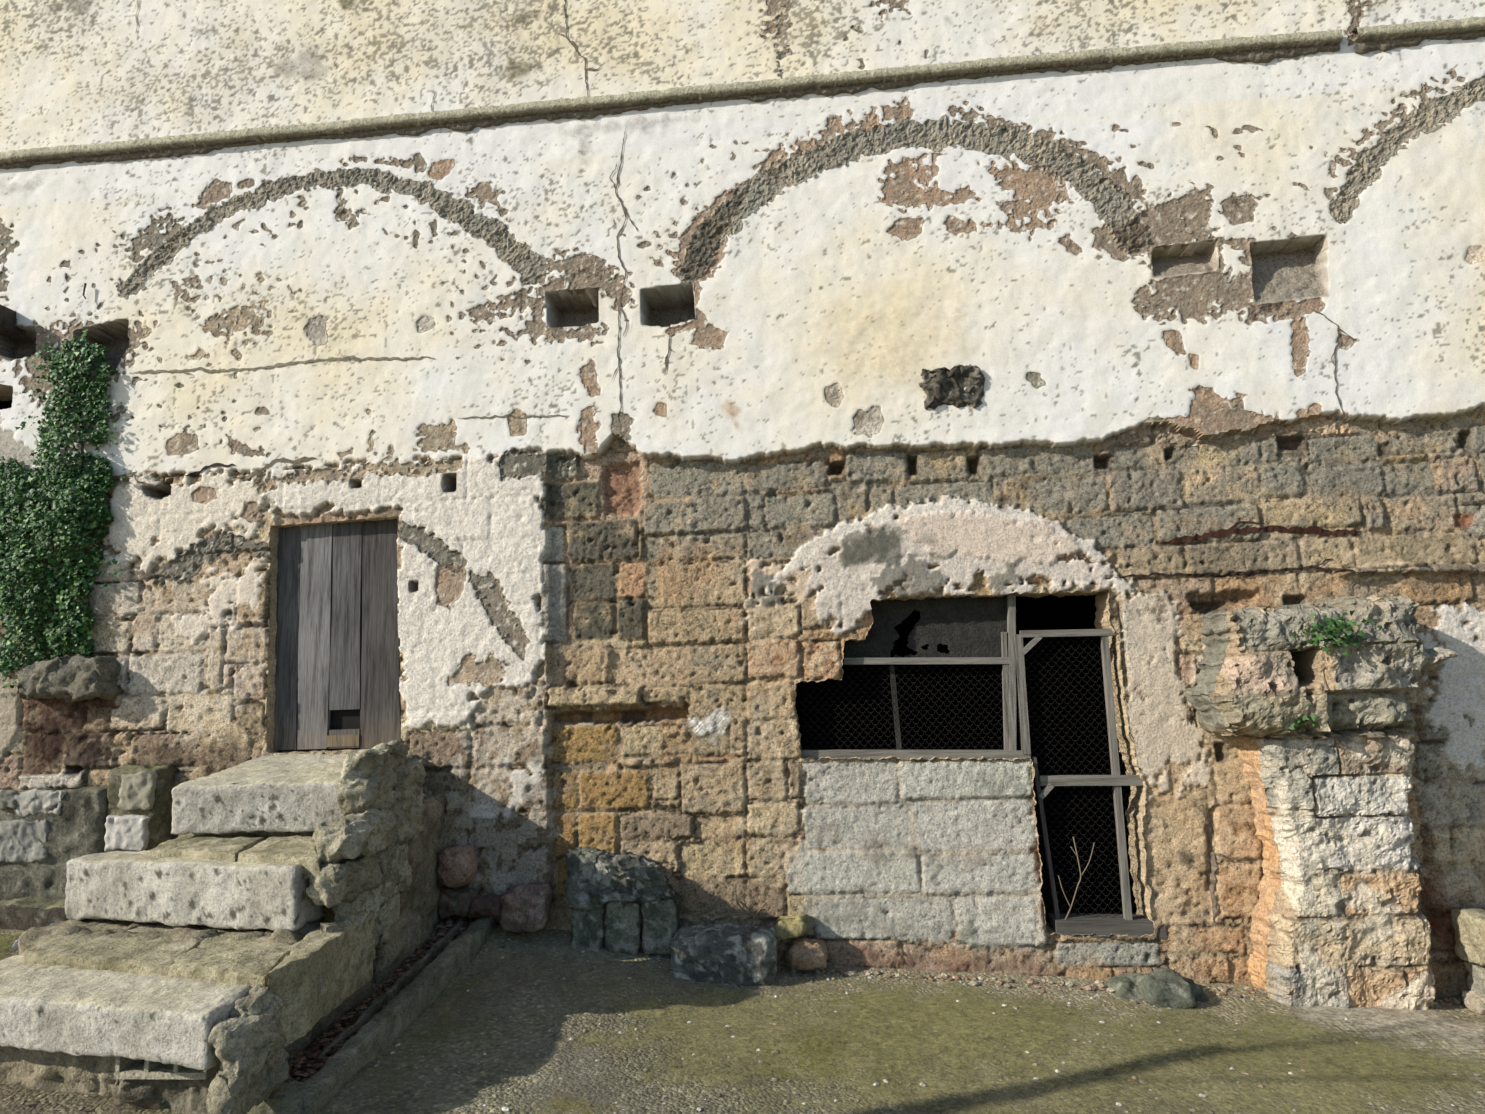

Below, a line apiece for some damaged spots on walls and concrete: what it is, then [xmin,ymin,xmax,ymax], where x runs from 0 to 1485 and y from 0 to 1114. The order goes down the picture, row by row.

crack [555,0,601,97]
flaking render [759,0,793,79]
flaking render [869,0,911,22]
flaking render [1343,0,1373,46]
flaking render [1293,68,1475,211]
flaking render [0,178,327,415]
crack [609,128,638,446]
flaking render [878,101,1358,451]
flaking render [151,399,469,589]
flaking render [398,521,530,687]